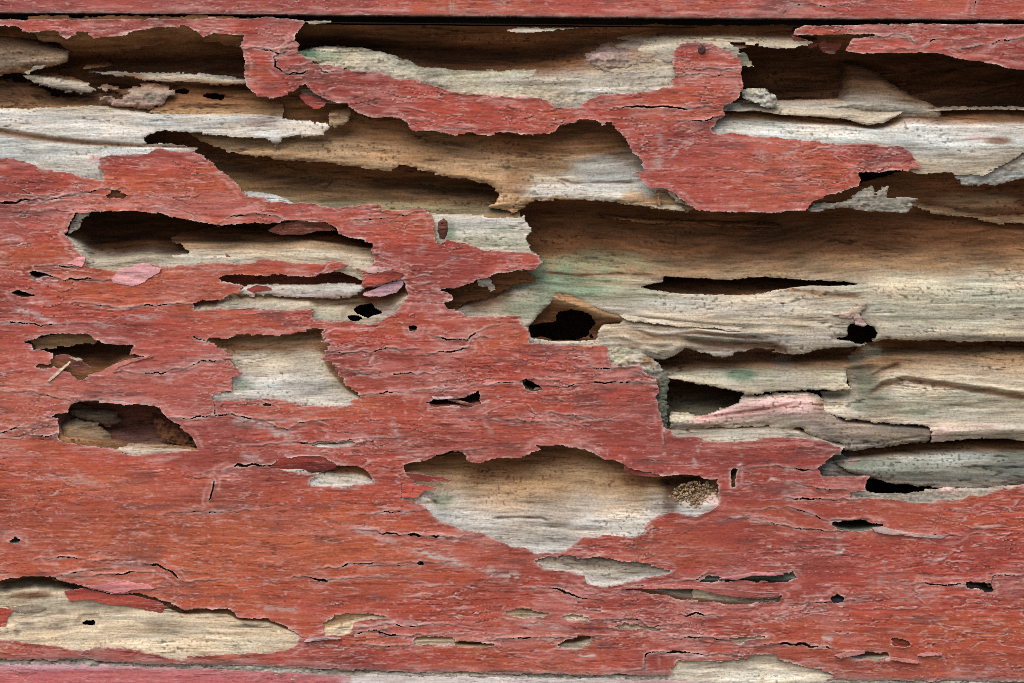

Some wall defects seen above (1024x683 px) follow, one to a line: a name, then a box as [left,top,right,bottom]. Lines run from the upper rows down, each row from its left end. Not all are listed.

peeling [0,105,330,180]
peeling [431,213,543,263]
peeling [193,328,360,407]
crack [438,333,476,353]
crack [193,463,261,513]
peeling [260,456,374,488]
crack [379,511,439,566]
crack [51,556,178,581]
peeling [535,555,797,605]
peeling [0,572,387,660]
crack [645,612,721,657]
crack [764,641,830,649]